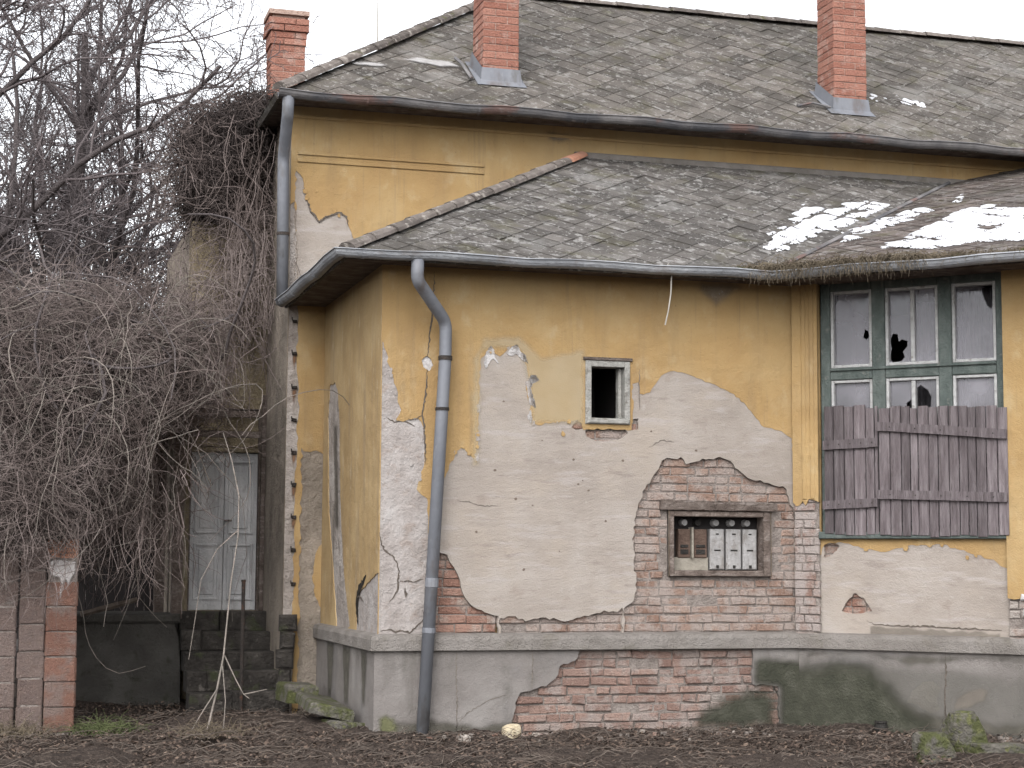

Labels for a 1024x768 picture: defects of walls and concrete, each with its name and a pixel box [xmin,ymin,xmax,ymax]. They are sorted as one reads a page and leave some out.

peeling [289,171,354,287]
crack [386,271,435,461]
peeling [283,305,1024,685]
crack [355,575,366,625]
crack [379,532,423,602]
crack [382,620,423,634]
spalling [512,649,779,736]